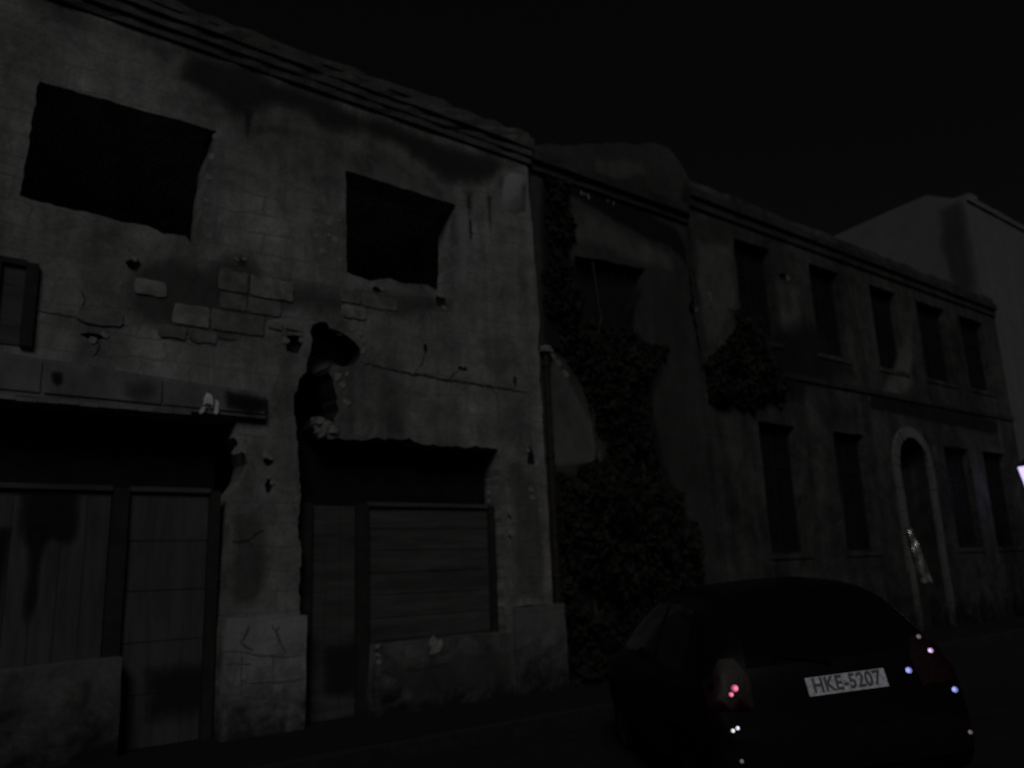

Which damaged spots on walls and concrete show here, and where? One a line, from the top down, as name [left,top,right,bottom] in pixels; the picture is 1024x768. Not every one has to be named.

flaking render [126,256,294,329]
crack [360,353,528,400]